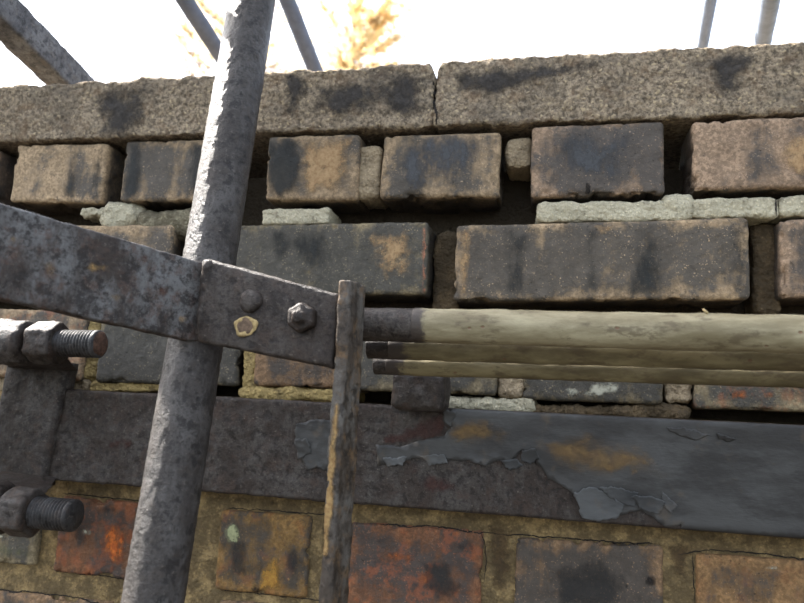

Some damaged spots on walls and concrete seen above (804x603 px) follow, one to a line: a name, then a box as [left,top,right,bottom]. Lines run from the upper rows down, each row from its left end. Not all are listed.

water stain [287,75,307,112]
water stain [321,75,420,115]
peeling [294,419,331,471]
peeling [376,409,804,538]
rust [106,528,123,561]
crack [687,549,804,598]